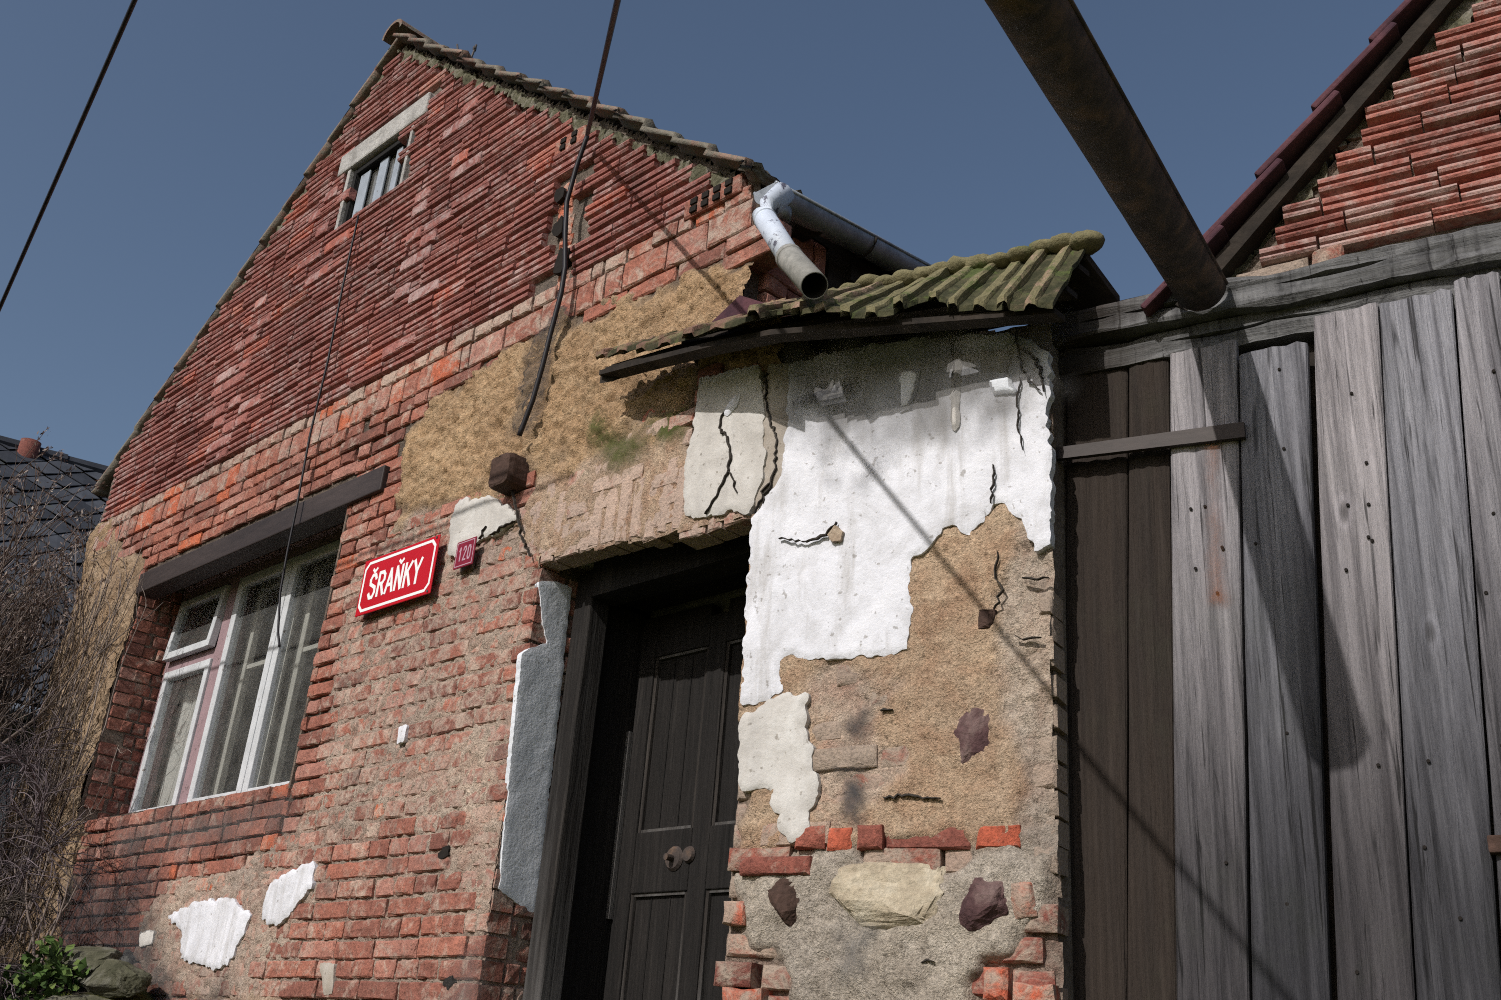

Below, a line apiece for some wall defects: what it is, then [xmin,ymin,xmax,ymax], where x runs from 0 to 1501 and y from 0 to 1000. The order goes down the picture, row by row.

flaking render [447,495,520,557]
crack [704,372,778,515]
flaking render [683,332,1056,843]
crack [989,327,1045,504]